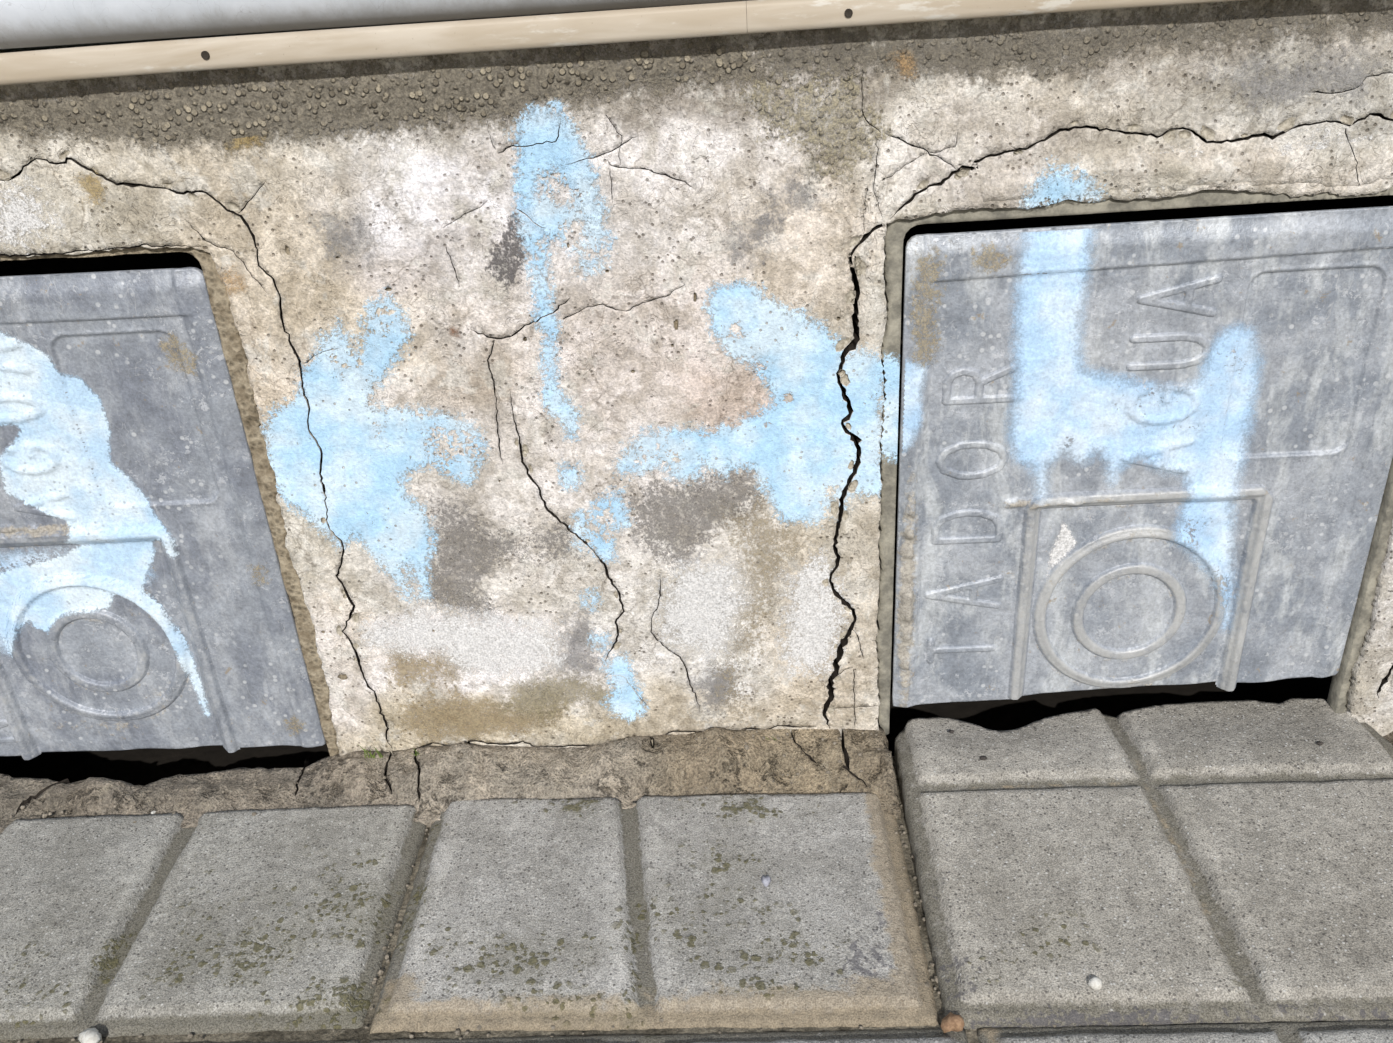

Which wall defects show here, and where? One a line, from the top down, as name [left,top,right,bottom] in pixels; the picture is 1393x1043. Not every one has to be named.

crack [487,115,691,194]
crack [0,150,590,801]
crack [471,285,700,748]
crack [745,72,1393,786]
crack [16,778,70,814]